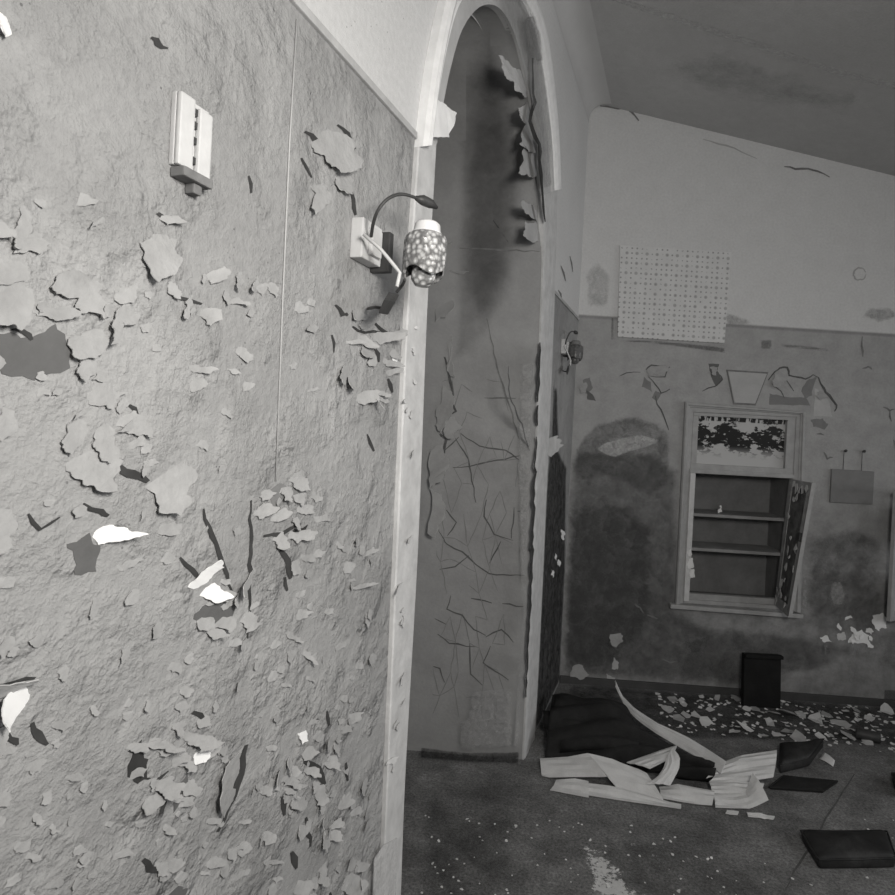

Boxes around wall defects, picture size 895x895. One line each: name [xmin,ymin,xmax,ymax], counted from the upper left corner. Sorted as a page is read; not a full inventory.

peeling [301,124,364,215]
peeling [0,205,140,409]
peeling [140,212,259,326]
peeling [61,404,198,516]
peeling [66,503,148,575]
peeling [179,474,318,640]
crack [433,320,541,725]
water stain [536,452,589,725]
peeling [0,677,40,758]
peeling [127,711,225,816]
peeling [265,730,396,895]
water stain [573,688,895,745]